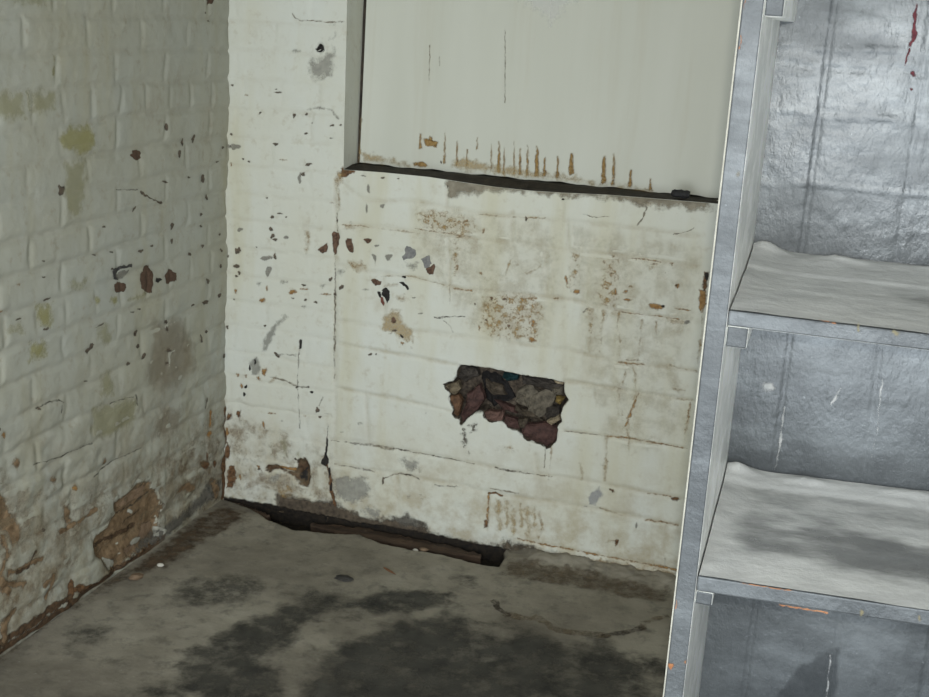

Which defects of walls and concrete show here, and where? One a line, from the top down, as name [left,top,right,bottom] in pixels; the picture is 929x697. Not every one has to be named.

rust [419,134,445,164]
rust [456,140,574,180]
rust [592,157,632,188]
rust [474,296,539,342]
spalling [443,365,568,449]
spalling [258,457,311,487]
peeling [0,495,43,596]
peeling [59,504,98,535]
spalling [93,481,167,572]
water stain [497,540,535,551]
water stain [143,591,666,697]